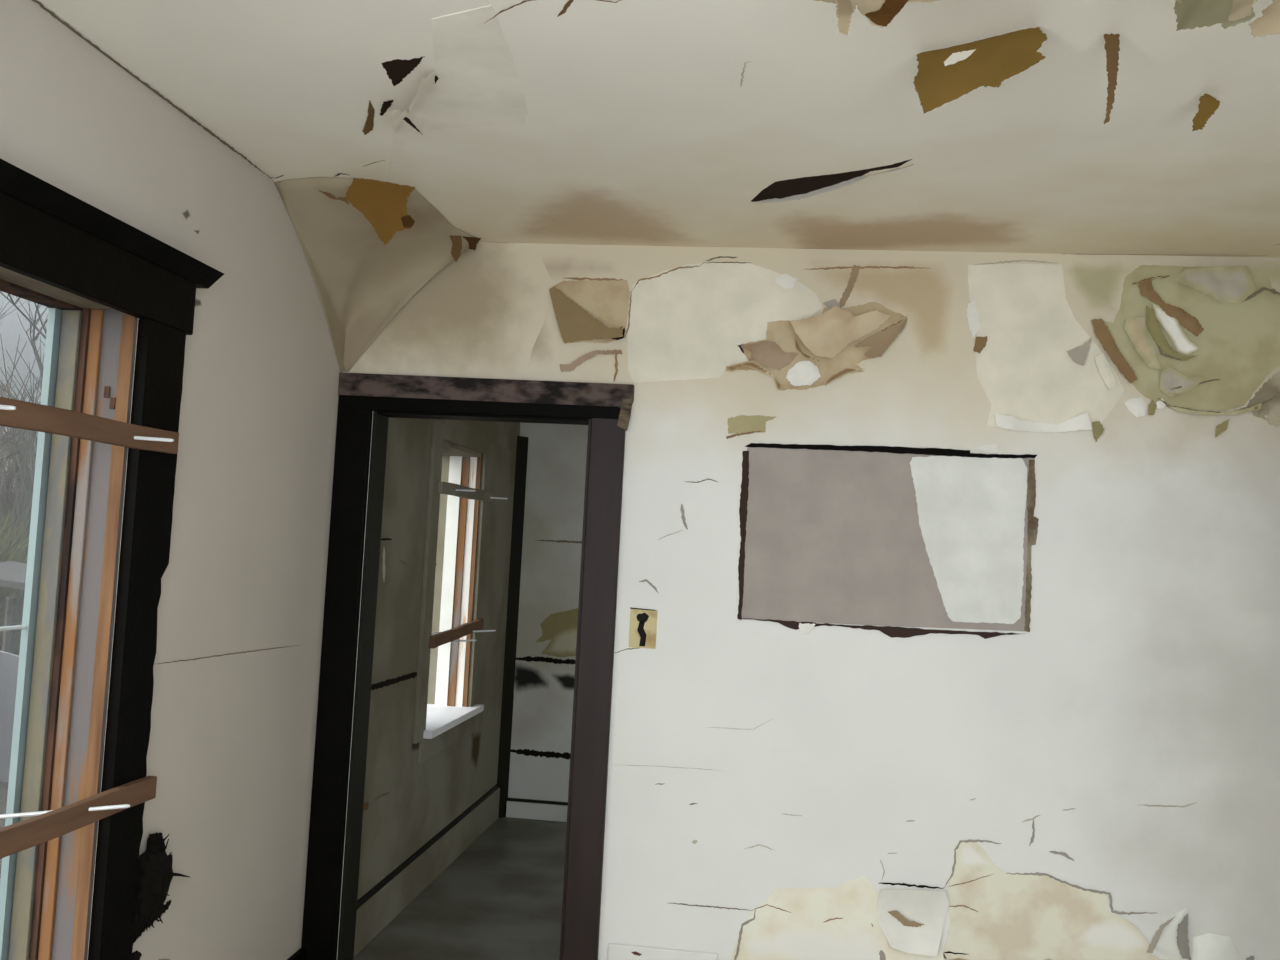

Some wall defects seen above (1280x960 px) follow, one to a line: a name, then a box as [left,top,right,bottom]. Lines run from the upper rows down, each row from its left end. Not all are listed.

crack [484,0,621,24]
peeling [726,302,907,390]
peeling [1091,265,1280,427]
crack [1137,800,1197,808]
crack [879,808,1075,912]